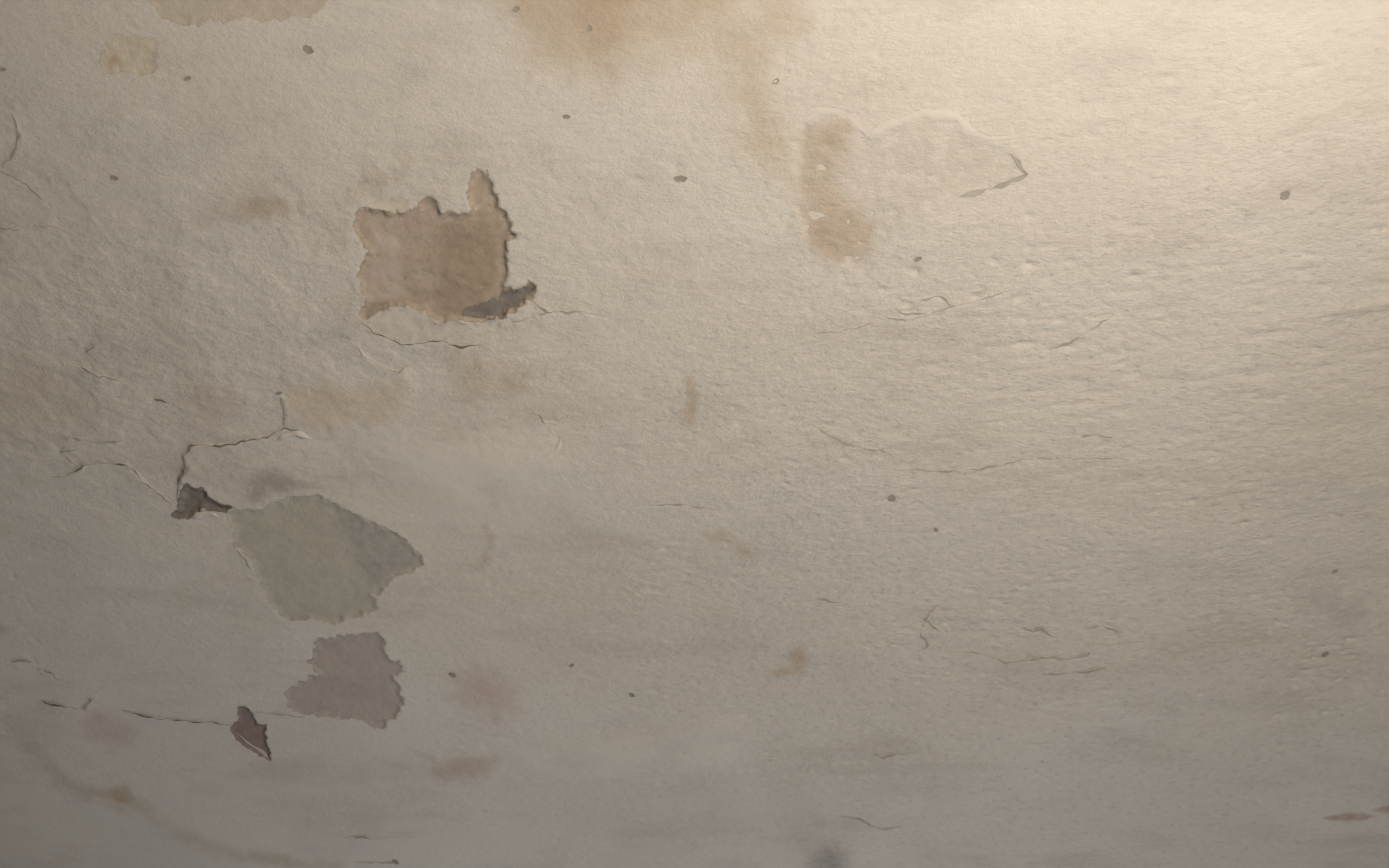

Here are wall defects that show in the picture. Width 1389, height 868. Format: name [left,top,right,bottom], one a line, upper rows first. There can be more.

peeling [148,0,335,27]
damp [475,0,837,200]
crack [0,113,70,235]
spalling [353,169,537,343]
peeling [786,106,1030,285]
crack [819,287,1024,333]
crack [54,389,312,504]
peeling [170,460,424,730]
spalling [230,706,271,761]